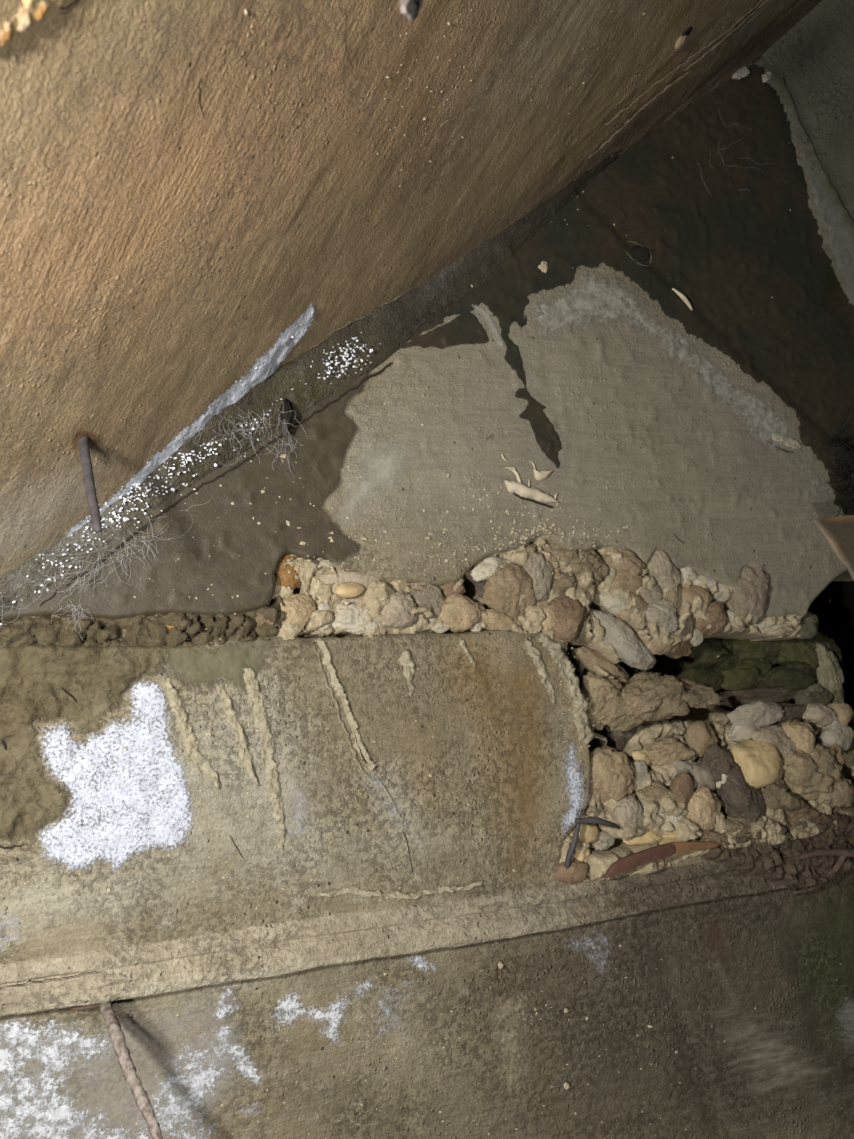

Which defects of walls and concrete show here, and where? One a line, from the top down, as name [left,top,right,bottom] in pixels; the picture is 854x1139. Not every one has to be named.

spalling [0,0,80,48]
damp [67,303,315,537]
damp [347,454,399,510]
peeling [500,454,558,508]
damp [0,371,369,872]
damp [0,986,261,1139]